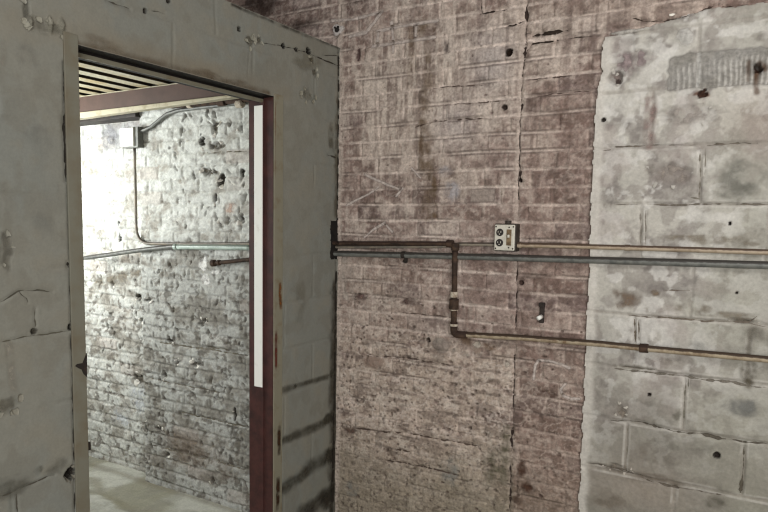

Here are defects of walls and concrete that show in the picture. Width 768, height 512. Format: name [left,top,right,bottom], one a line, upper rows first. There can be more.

crack [60,70,68,178]
crack [416,4,589,210]
crack [1,289,72,362]
crack [512,268,520,327]
crack [68,391,76,512]
crack [508,355,516,508]